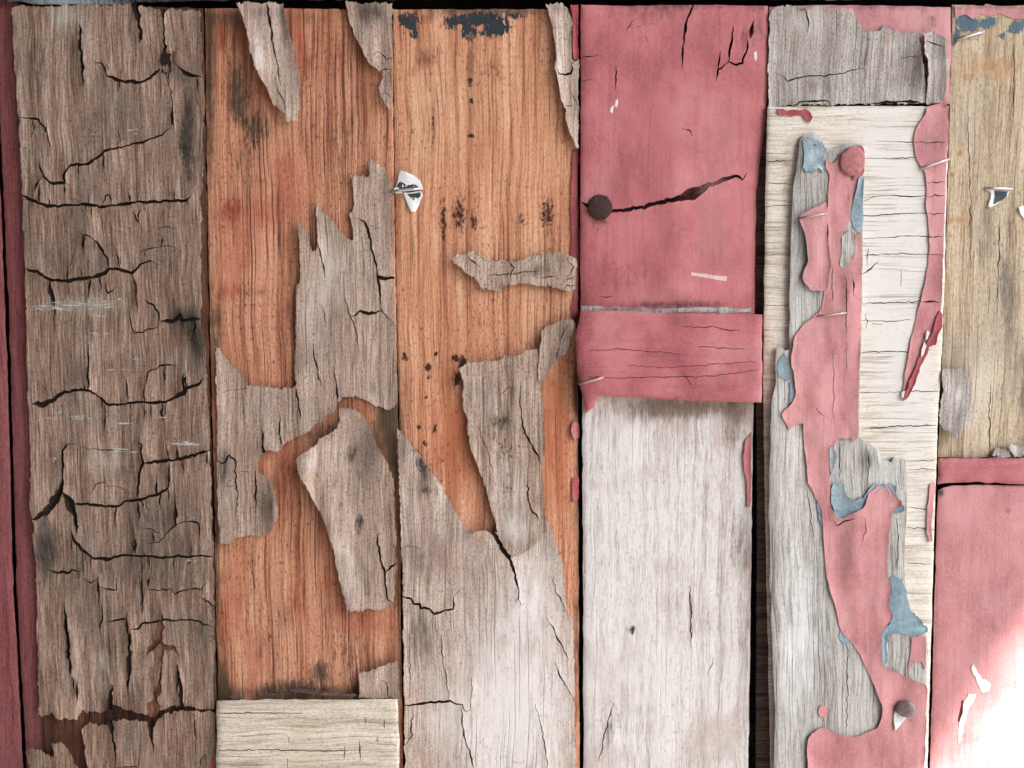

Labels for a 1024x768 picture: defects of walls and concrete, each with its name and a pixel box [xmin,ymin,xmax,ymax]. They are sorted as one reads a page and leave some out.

peeling [398,9,421,39]
peeling [443,11,529,42]
crack [681,2,694,66]
crack [716,27,749,81]
peeling [952,4,1024,47]
peeling [777,108,812,122]
crack [19,0,202,340]
crack [581,160,794,213]
peeling [902,103,949,401]
peeling [777,137,928,768]
crack [31,218,395,768]
peeling [926,482,936,542]